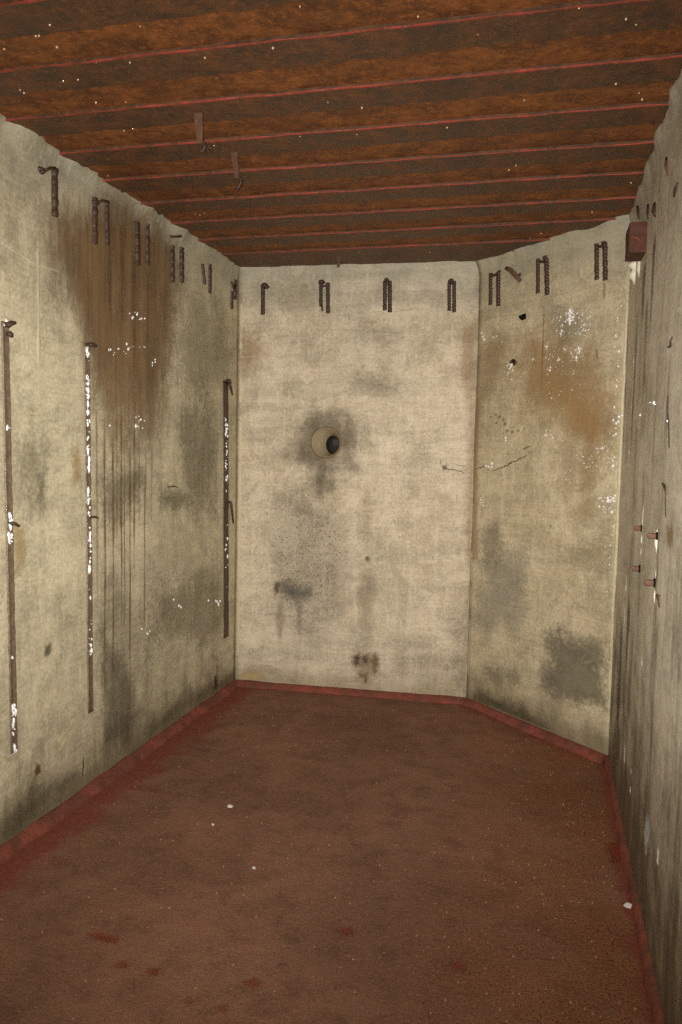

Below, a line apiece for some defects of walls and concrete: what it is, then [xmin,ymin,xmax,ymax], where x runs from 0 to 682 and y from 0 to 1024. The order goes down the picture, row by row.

corrosion [58,200,174,648]
crack [440,446,530,474]
corrosion [530,319,597,440]
leakage [545,308,591,399]
leakage [541,609,629,720]